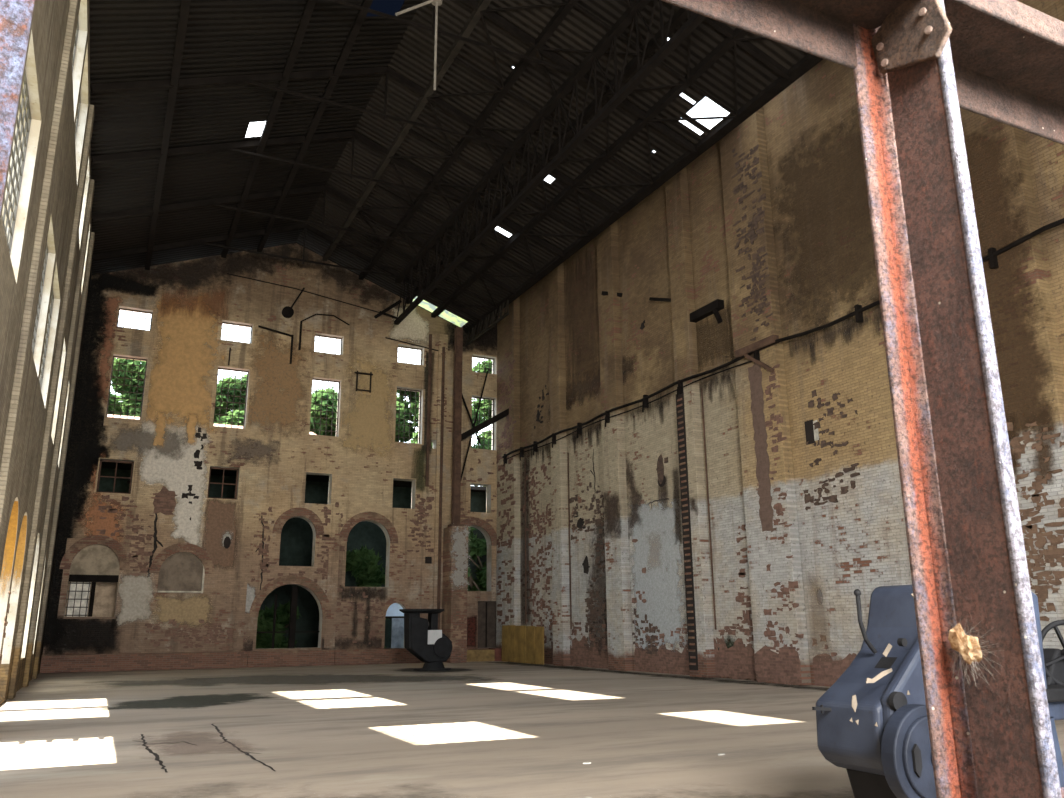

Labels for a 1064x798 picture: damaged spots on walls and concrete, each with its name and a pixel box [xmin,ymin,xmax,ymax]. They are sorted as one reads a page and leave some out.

water stain [774,110,882,365]
water stain [964,127,1056,482]
crack [146,513,163,578]
spalling [194,427,207,470]
flaking render [569,482,608,668]
flaking render [632,591,690,675]
flaking render [748,363,793,558]
flaking render [714,525,856,686]
peeling [803,463,860,511]
peeling [1006,422,1064,621]
crack [138,734,195,773]
crack [211,724,275,771]